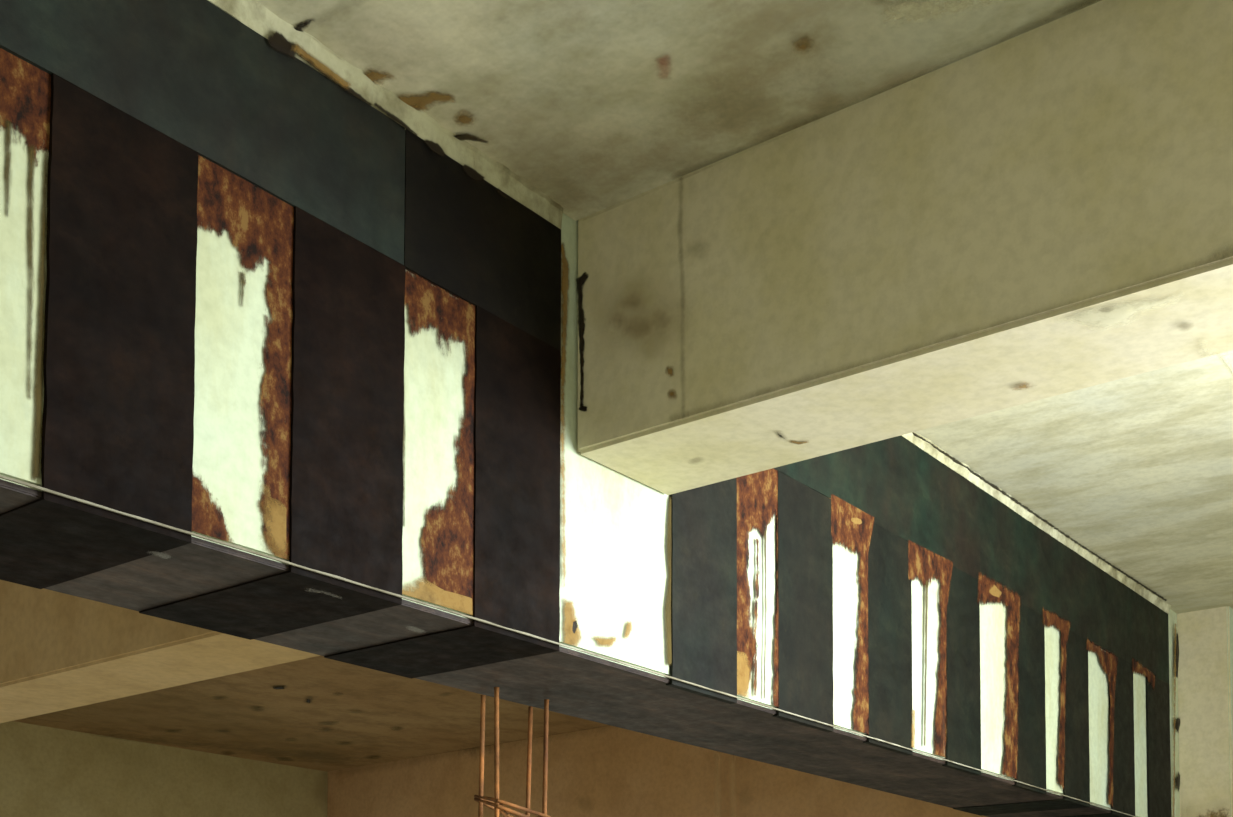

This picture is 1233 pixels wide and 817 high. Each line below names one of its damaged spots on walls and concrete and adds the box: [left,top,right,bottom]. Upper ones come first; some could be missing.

rust [0,48,51,480]
rust [192,155,294,560]
rust [402,269,475,615]
rust [560,243,632,647]
rust [736,468,779,707]
rust [831,494,875,734]
rust [908,540,953,757]
rust [977,573,1021,779]
rust [1042,607,1071,789]
rust [1086,638,1156,807]